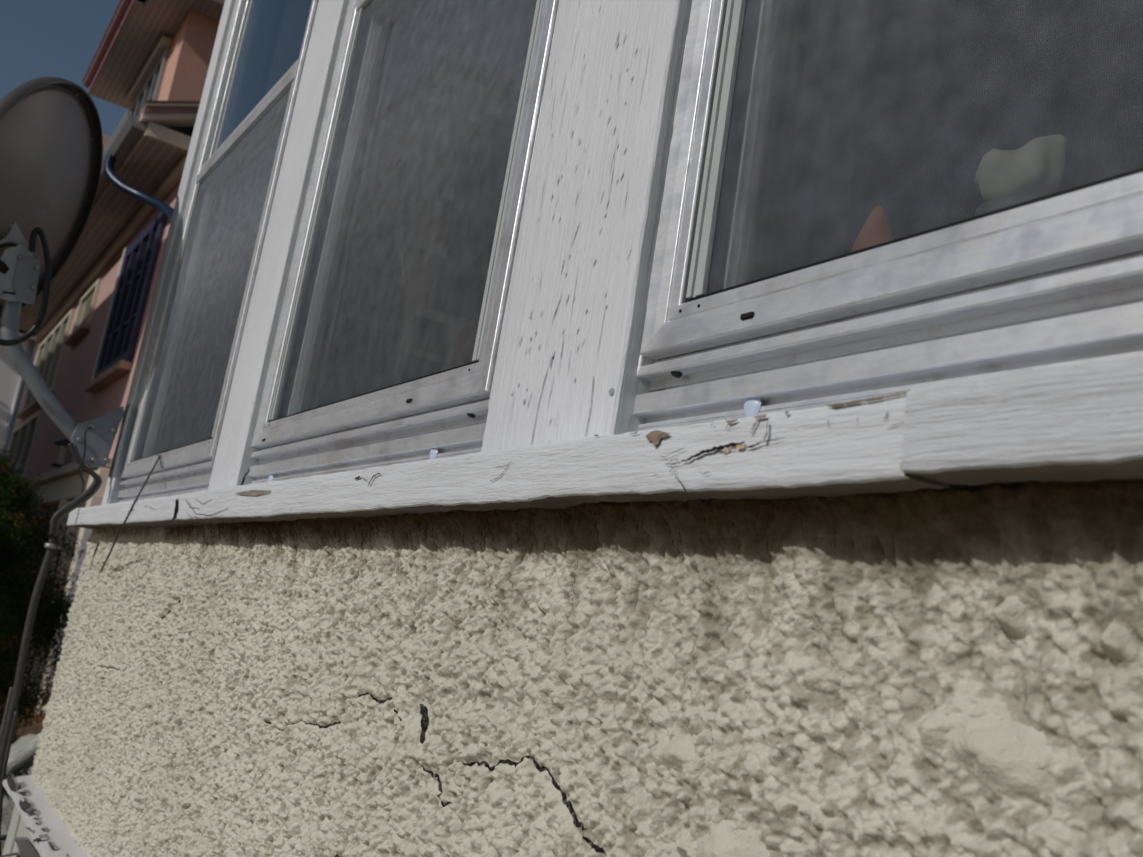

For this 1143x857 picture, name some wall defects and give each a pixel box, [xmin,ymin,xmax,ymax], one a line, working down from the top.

peeling [646,430,670,446]
crack [653,420,785,492]
crack [264,720,341,731]
crack [357,692,606,855]
peeling [6,772,70,857]